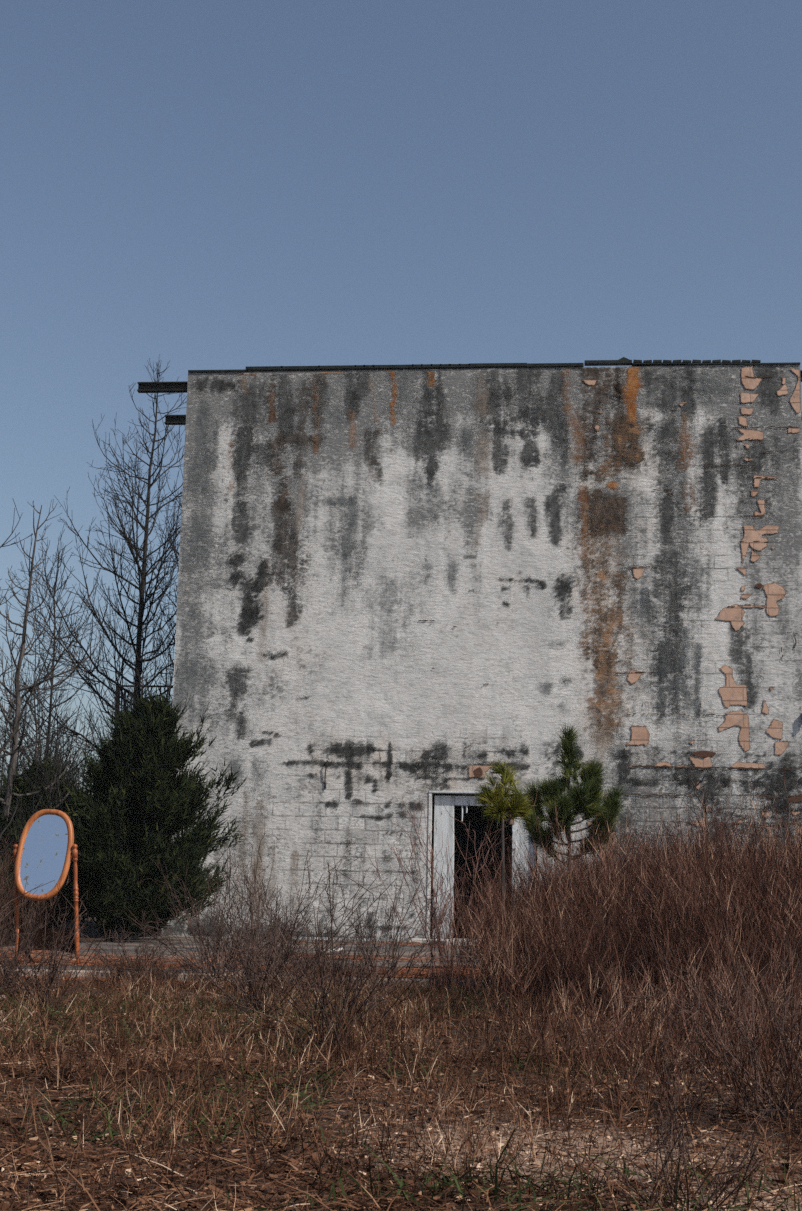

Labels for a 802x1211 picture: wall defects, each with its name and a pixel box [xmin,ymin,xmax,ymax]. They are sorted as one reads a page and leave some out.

leakage [191,371,371,641]
leakage [390,370,472,510]
corrosion [581,490,629,739]
corrosion [600,367,641,489]
leakage [476,365,801,722]
peeling [736,366,764,461]
peeling [716,475,786,631]
peeling [777,368,801,413]
leakage [174,662,280,747]
leakage [280,740,530,881]
leakage [544,738,802,860]
peeling [654,740,716,768]